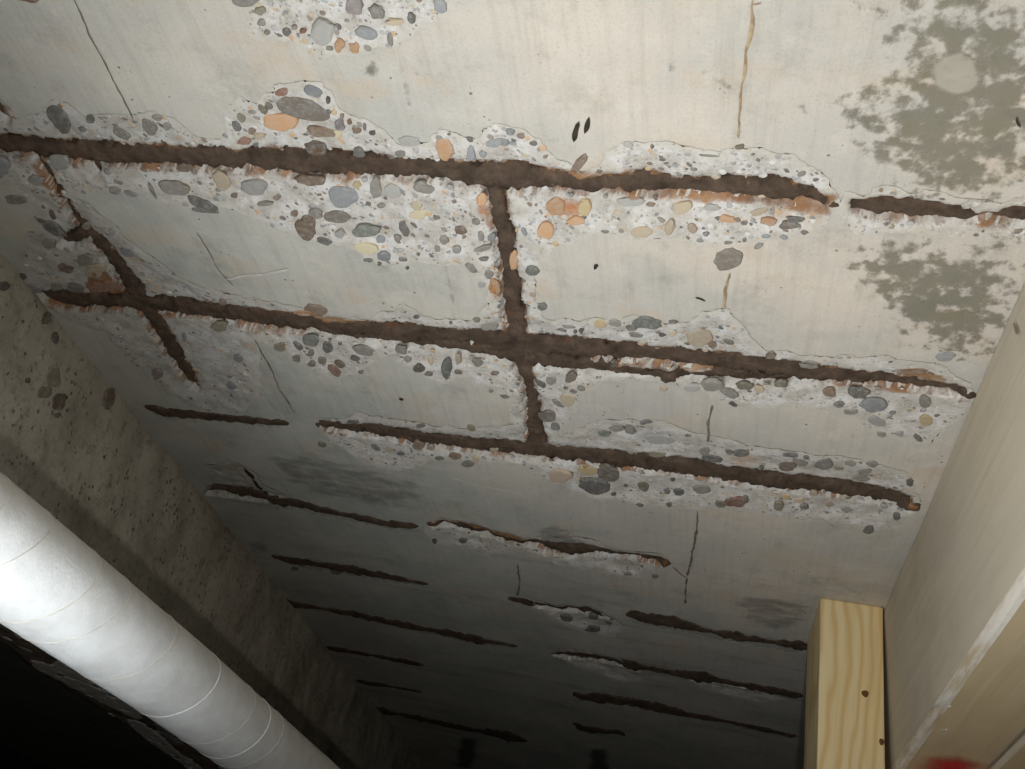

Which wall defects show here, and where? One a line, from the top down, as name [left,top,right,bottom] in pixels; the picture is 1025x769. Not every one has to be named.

spalling [231,0,449,59]
crack [737,0,761,138]
water stain [843,0,1025,202]
spalling [0,80,1025,534]
water stain [848,242,1018,362]
peeling [0,624,224,769]
spalling [271,554,428,585]
spalling [326,646,425,666]
spalling [287,599,517,648]
spalling [199,459,671,579]
spalling [508,597,807,652]